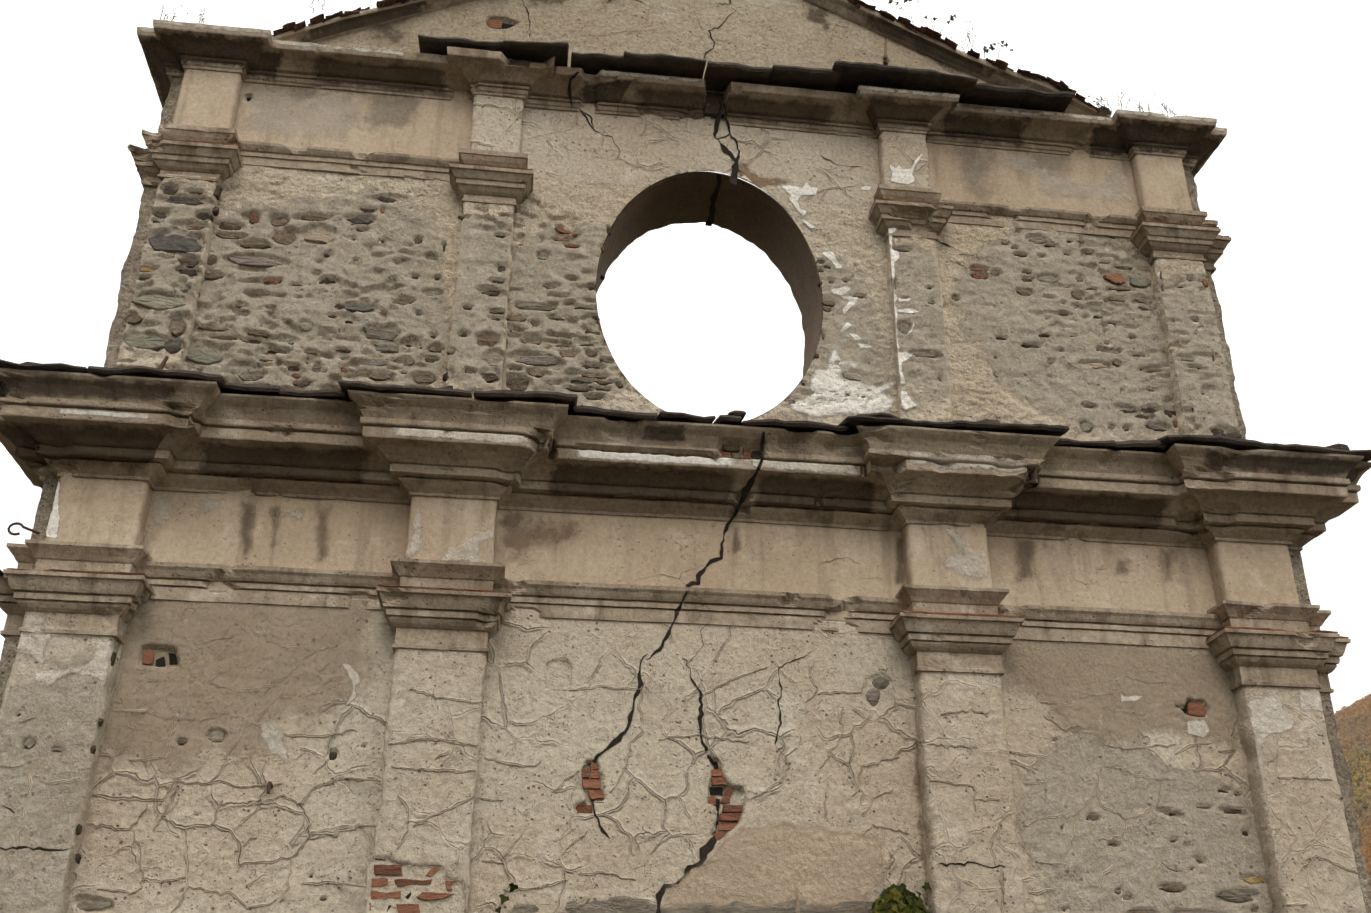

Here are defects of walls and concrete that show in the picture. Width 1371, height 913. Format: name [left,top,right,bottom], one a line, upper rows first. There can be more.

crack [694,0,736,58]
crack [528,67,762,226]
flaking render [784,227,1242,439]
crack [0,432,1236,913]
flaking render [1186,702,1206,717]
spalling [574,759,605,814]
spalling [707,753,746,841]
crack [1266,754,1332,781]
spalling [365,857,466,913]
crack [1286,853,1358,907]